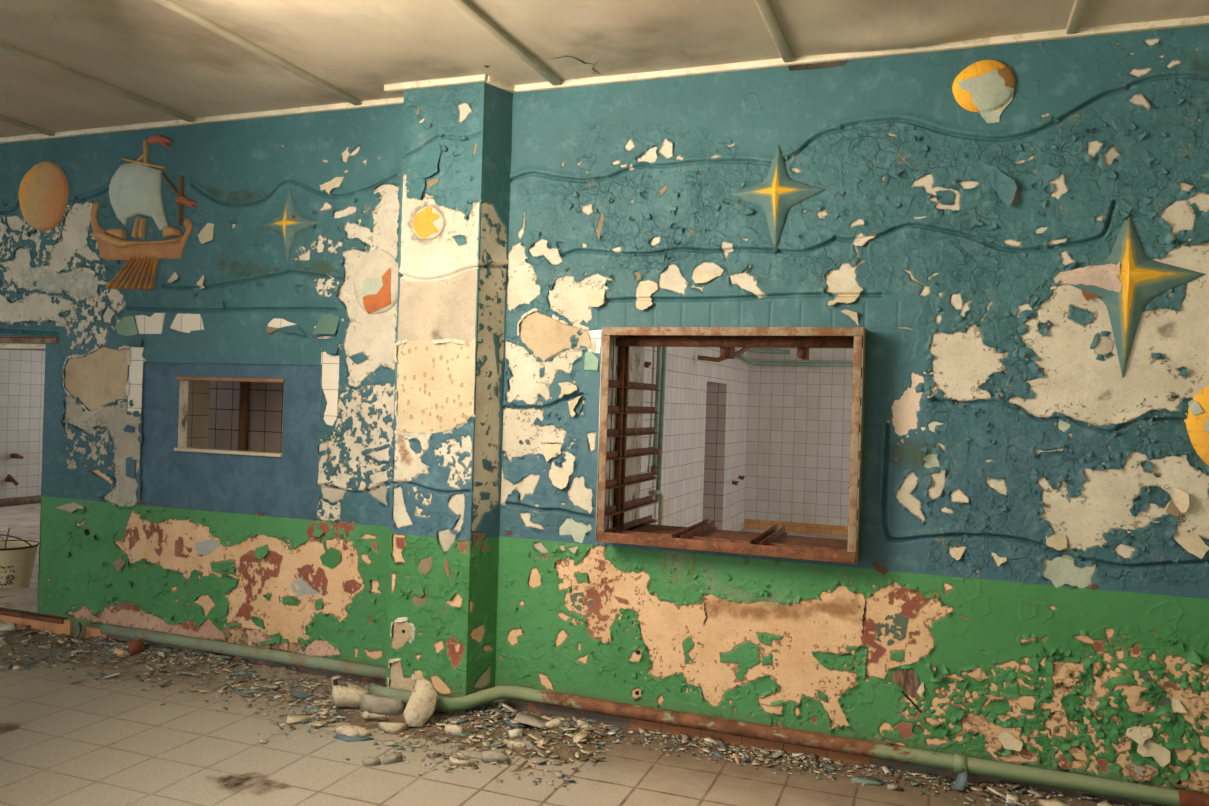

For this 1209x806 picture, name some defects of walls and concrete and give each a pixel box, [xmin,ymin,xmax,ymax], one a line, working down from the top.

peeling [453,103,472,124]
peeling [567,139,768,310]
peeling [803,191,876,325]
peeling [1071,122,1166,187]
peeling [0,132,615,658]
peeling [882,144,1209,590]
flaking render [354,617,516,695]
peeling [520,512,1209,793]